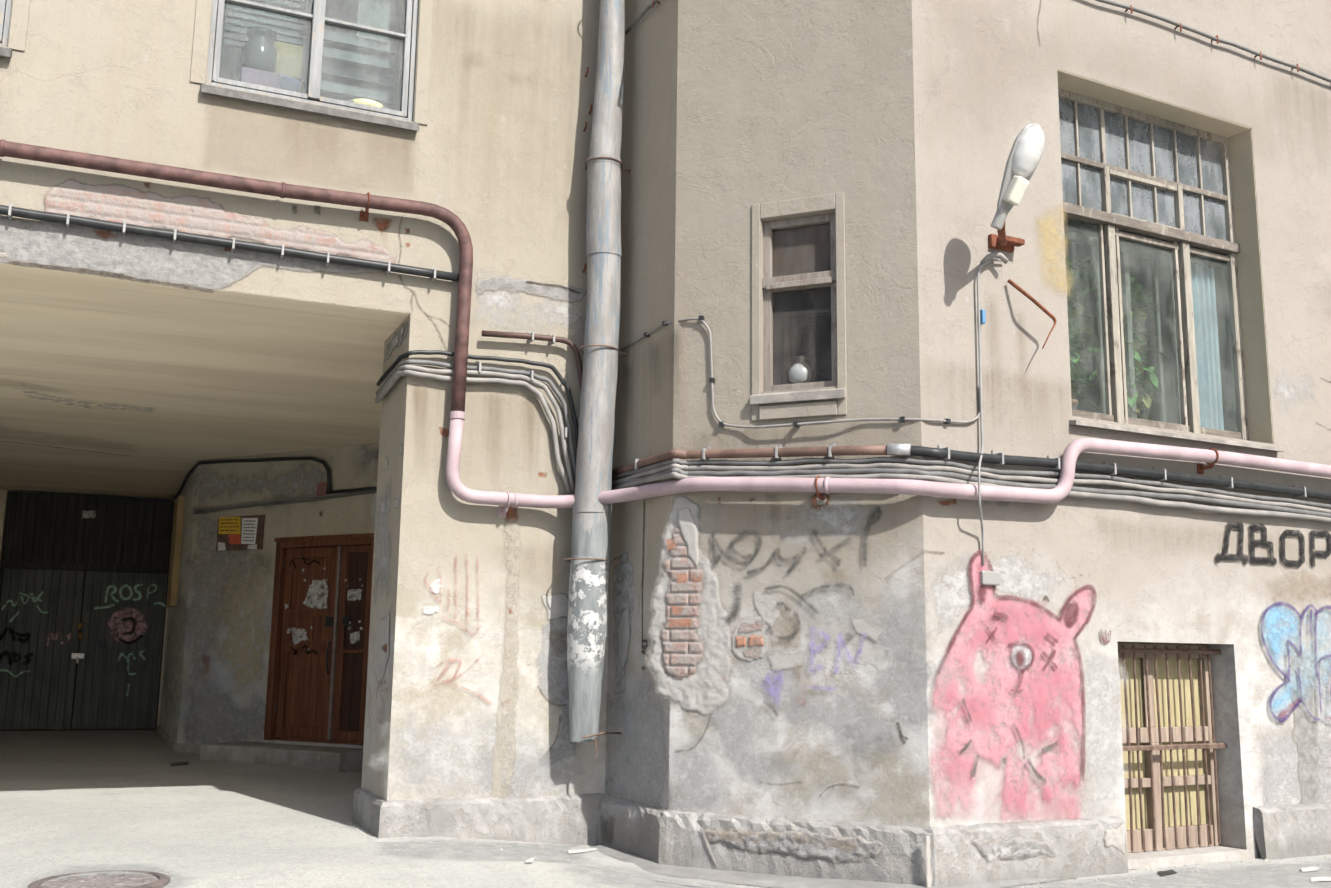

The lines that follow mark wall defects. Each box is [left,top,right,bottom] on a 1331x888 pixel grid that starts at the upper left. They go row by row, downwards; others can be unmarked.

flaking render [0,179,395,293]
crack [398,216,448,351]
peeling [613,552,634,693]
flaking render [647,496,804,715]